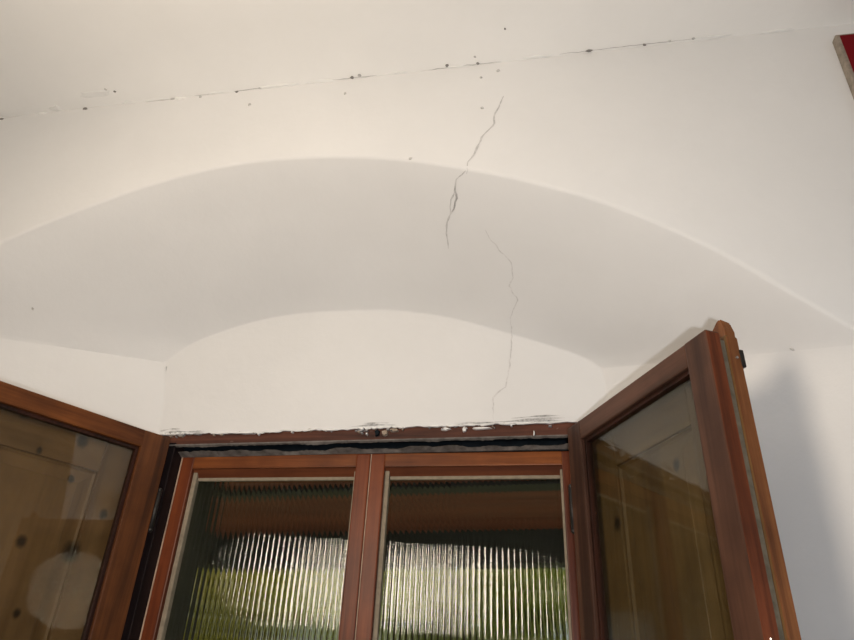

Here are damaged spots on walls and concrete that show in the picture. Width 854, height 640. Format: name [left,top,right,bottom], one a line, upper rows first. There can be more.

crack [522,34,732,59]
crack [80,56,500,110]
crack [446,96,504,249]
crack [485,230,518,414]
flaking render [355,426,404,437]
flaking render [427,421,552,436]